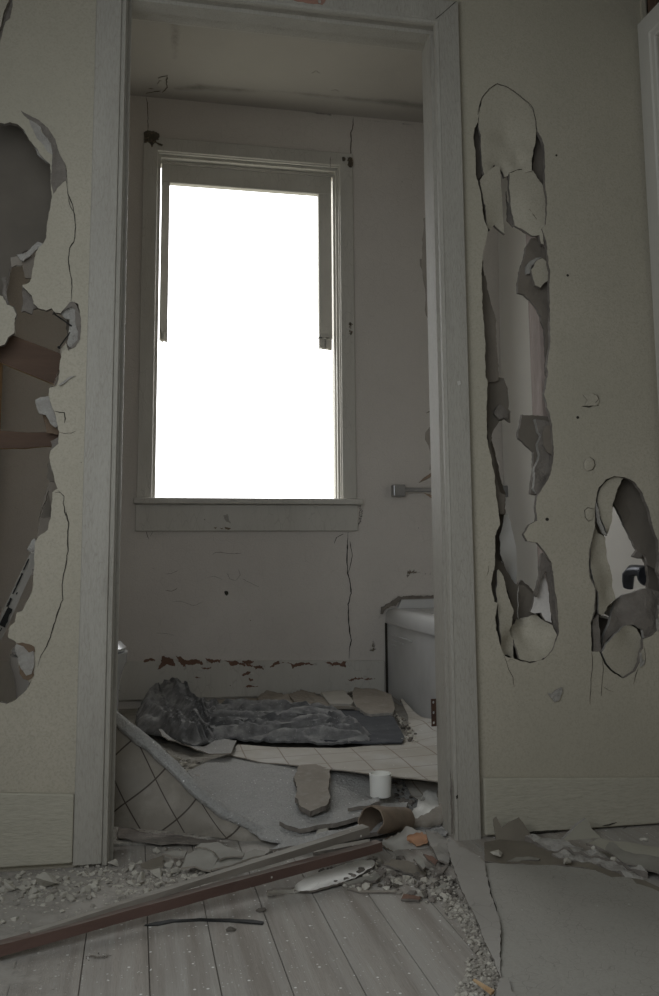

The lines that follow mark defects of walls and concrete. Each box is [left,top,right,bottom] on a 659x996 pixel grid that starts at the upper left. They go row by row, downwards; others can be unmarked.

spalling [0,0,13,40]
spalling [21,111,67,194]
spalling [473,84,548,376]
spalling [2,242,43,315]
spalling [60,302,81,354]
spalling [482,276,557,662]
spalling [0,396,59,631]
crack [334,534,353,651]
spalling [589,477,659,677]
spalling [15,643,35,680]
peeling [143,656,346,688]